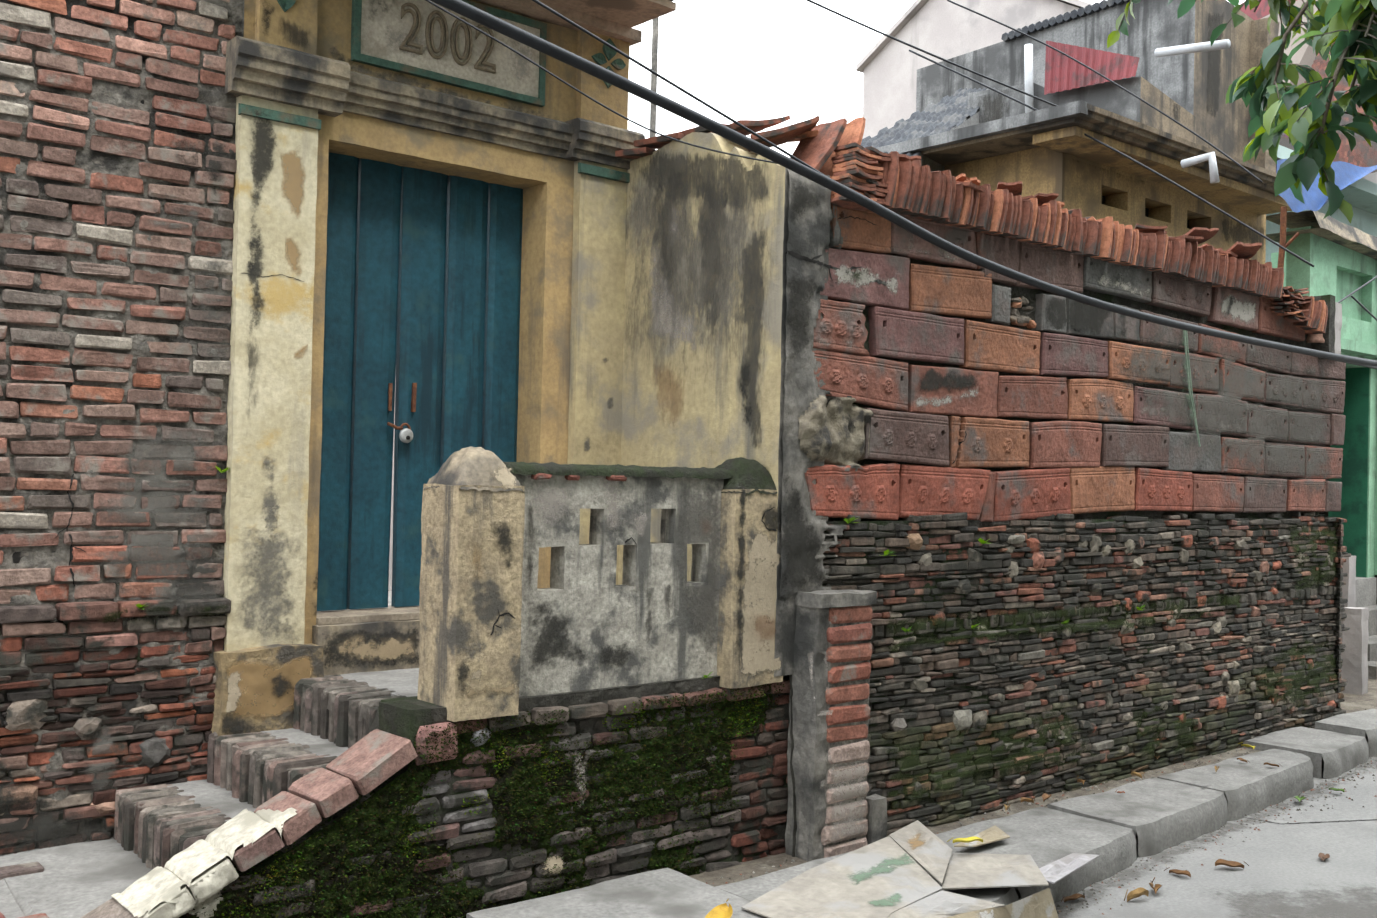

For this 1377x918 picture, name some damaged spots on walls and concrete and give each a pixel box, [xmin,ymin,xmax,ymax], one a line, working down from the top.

peeling [282,151,305,215]
water stain [248,111,275,325]
peeling [285,239,300,274]
water stain [635,154,767,447]
water stain [493,523,512,567]
water stain [646,491,745,650]
spalling [222,657,312,734]
water stain [457,663,469,691]
crack [490,609,515,635]
water stain [532,604,582,668]
water stain [603,644,630,665]